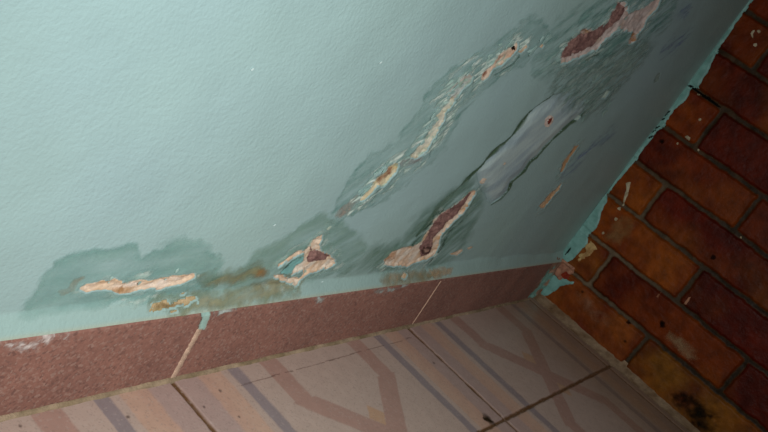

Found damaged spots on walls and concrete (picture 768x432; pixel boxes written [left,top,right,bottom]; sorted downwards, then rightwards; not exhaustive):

peeling [552,0,665,65]
peeling [347,33,530,216]
peeling [274,226,341,286]
peeling [376,178,486,279]
peeling [80,268,195,313]